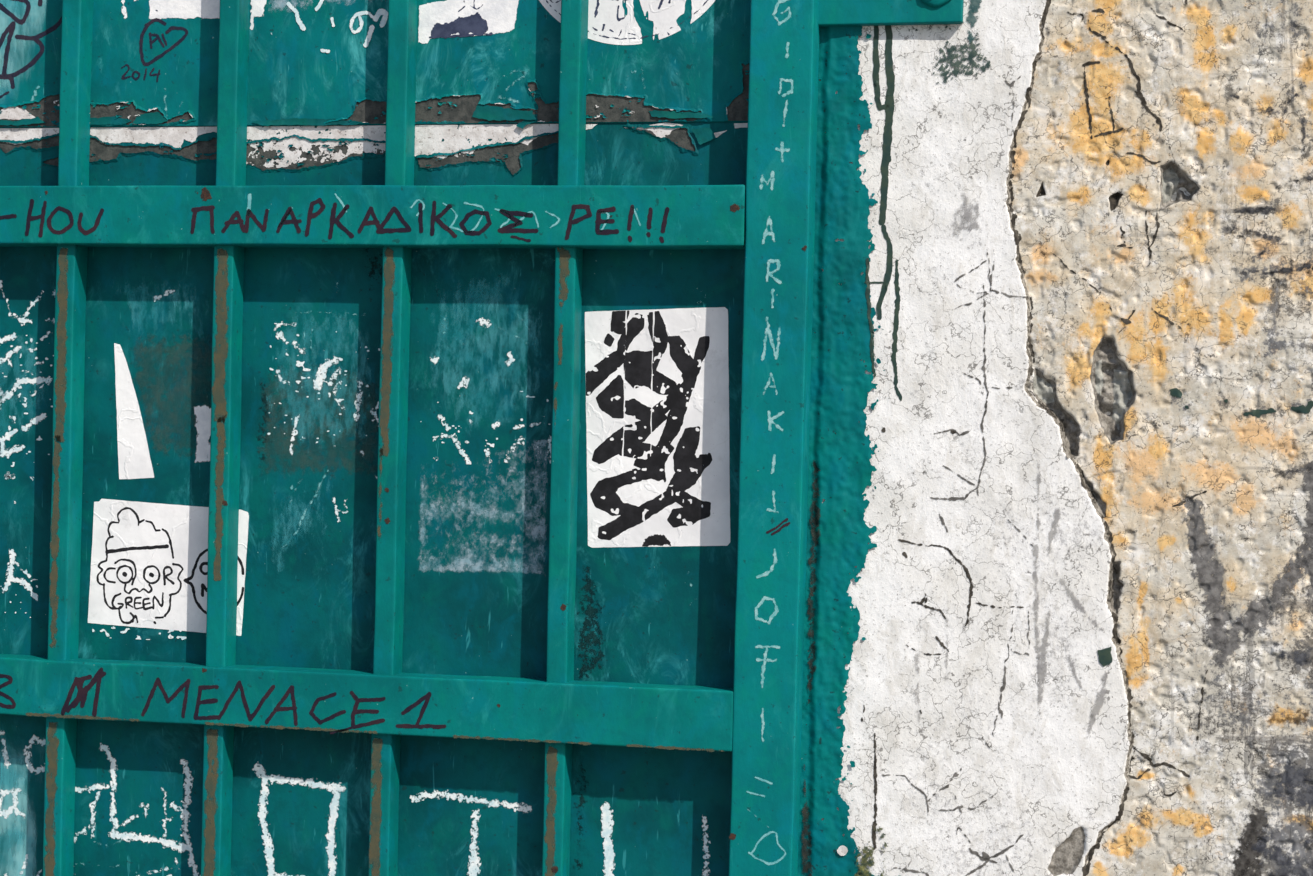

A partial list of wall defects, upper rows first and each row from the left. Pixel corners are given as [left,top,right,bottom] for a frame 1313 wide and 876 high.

peeling [0,93,60,167]
peeling [89,100,217,164]
peeling [246,96,386,172]
peeling [415,79,559,176]
corrosion [50,248,68,648]
corrosion [212,249,229,581]
corrosion [377,248,395,537]
crack [882,0,1190,876]
flaking render [1090,337,1136,444]
crack [1172,487,1217,507]
crack [1196,670,1208,740]
flaking render [1048,827,1085,876]